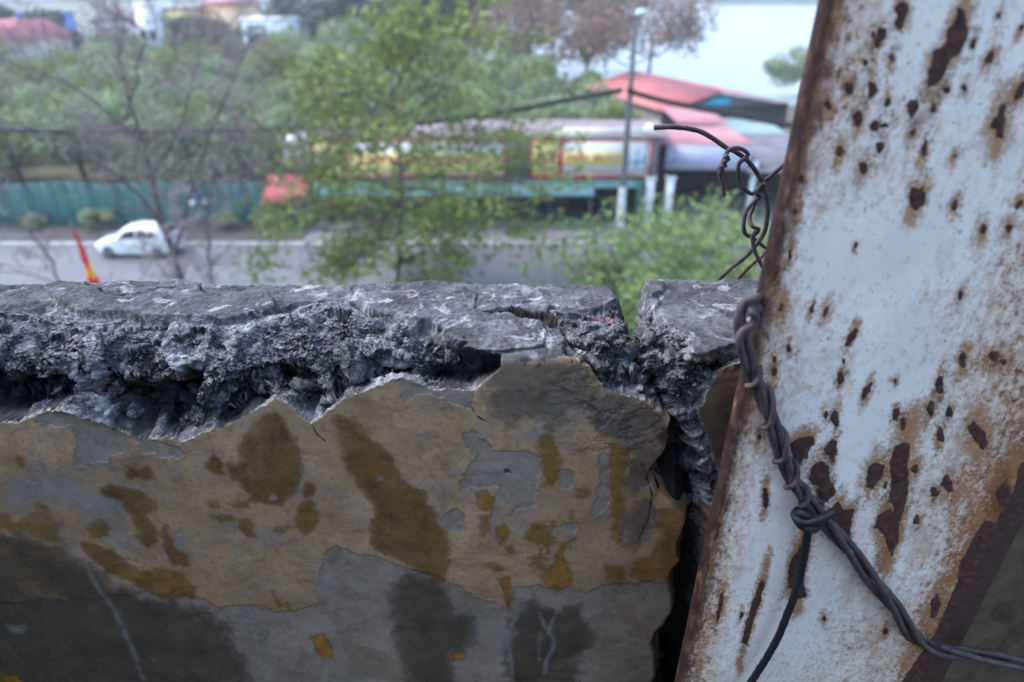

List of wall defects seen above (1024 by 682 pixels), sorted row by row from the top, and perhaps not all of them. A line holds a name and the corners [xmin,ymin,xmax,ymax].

rust [821,0,1024,226]
damp [0,524,244,682]
damp [102,468,188,565]
damp [207,414,314,536]
spalling [0,279,548,468]
damp [337,419,470,682]
peeling [458,429,543,517]
crack [626,455,659,540]
spalling [556,299,740,505]
rust [735,547,772,676]
rust [782,531,814,618]
rust [789,319,1024,682]